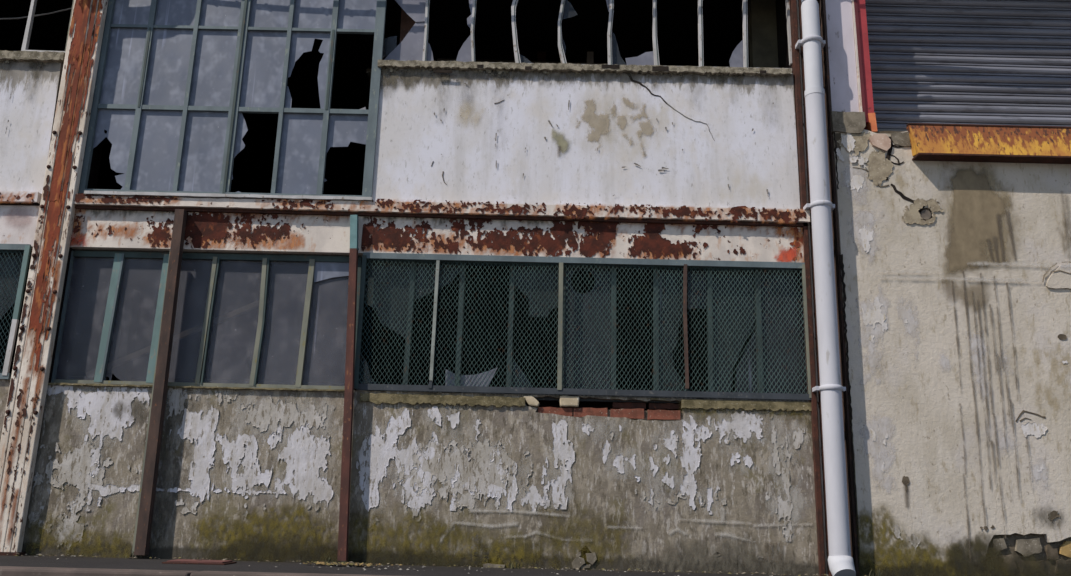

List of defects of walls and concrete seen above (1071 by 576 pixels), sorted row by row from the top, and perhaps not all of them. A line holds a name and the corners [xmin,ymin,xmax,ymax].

crack [627,73,715,141]
corrosion [0,0,806,540]
flaking render [833,131,911,262]
spalling [902,198,944,225]
peeling [2,175,150,550]
water stain [944,169,1047,525]
peeling [156,388,335,517]
water stain [440,509,559,543]
peeling [356,401,805,542]
flaking render [980,511,1071,576]